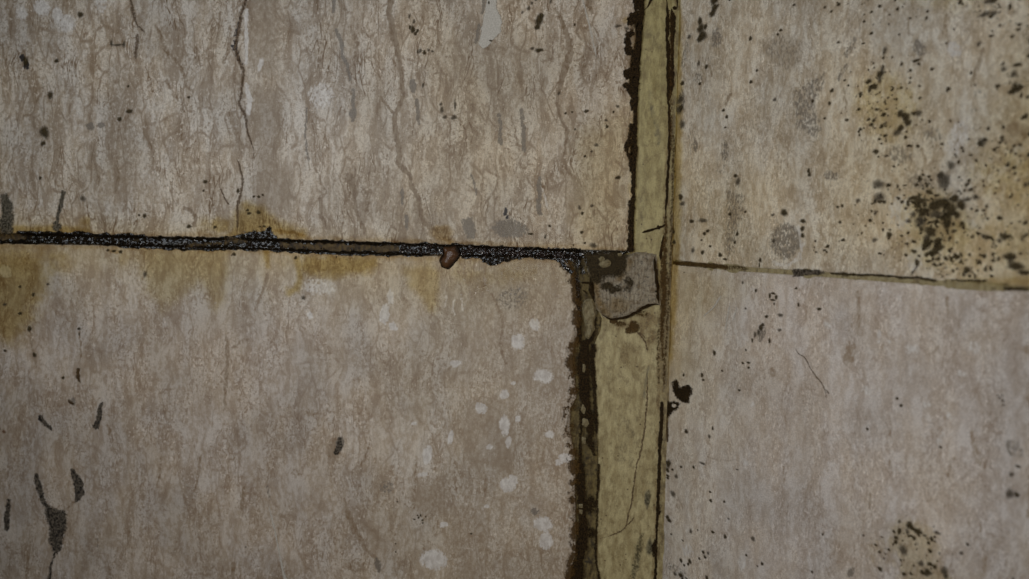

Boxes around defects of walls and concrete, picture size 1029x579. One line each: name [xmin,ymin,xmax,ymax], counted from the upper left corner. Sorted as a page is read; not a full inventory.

water stain [687,0,730,42]
water stain [958,0,1029,46]
crack [220,0,254,228]
water stain [800,48,1029,290]
water stain [0,0,645,579]
spalling [582,250,661,339]
water stain [742,289,783,369]
water stain [632,374,704,579]
water stain [874,520,969,579]